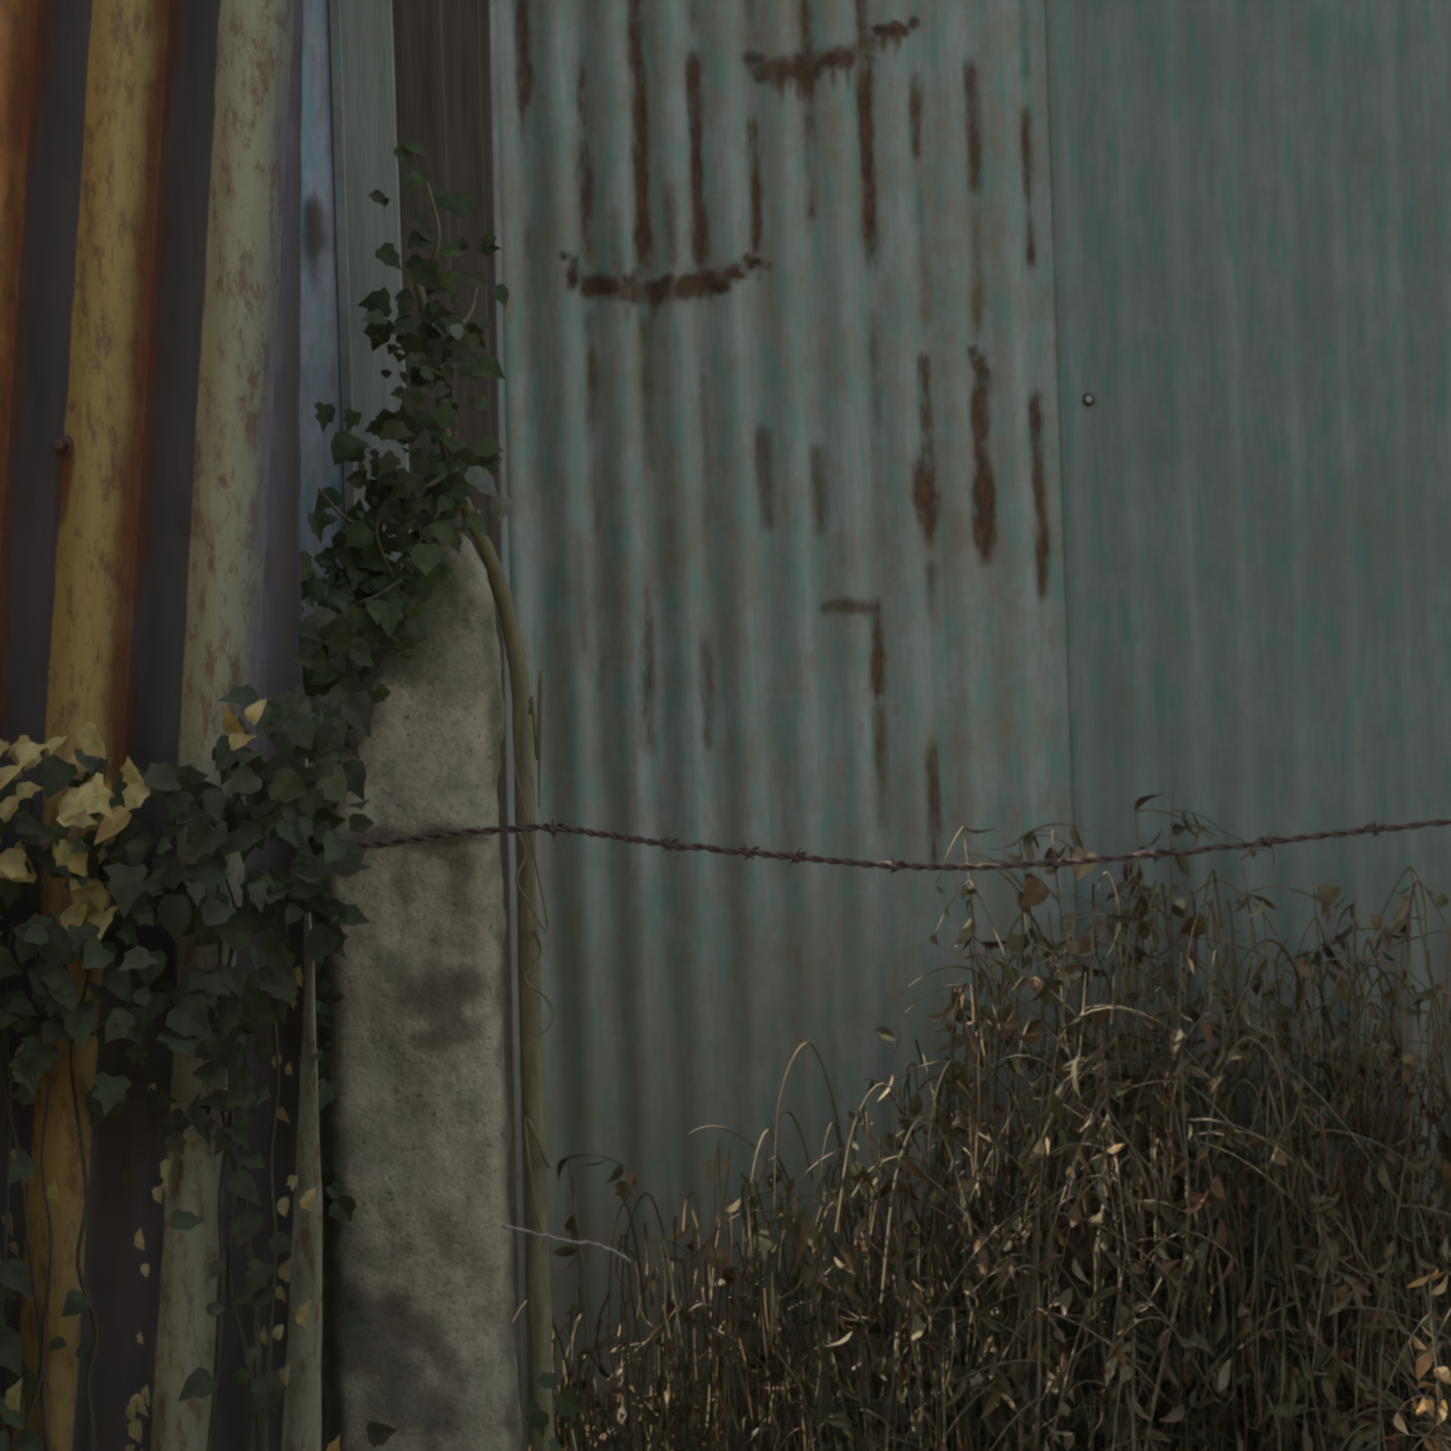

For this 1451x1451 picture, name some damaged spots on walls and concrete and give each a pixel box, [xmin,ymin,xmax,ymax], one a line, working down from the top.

rust [516,0,531,122]
rust [561,0,761,306]
rust [746,0,918,260]
rust [911,90,921,156]
rust [965,66,980,191]
rust [1022,113,1030,201]
rust [919,357,931,433]
rust [914,454,938,539]
rust [969,346,994,560]
rust [1030,394,1049,597]
rust [823,600,884,696]